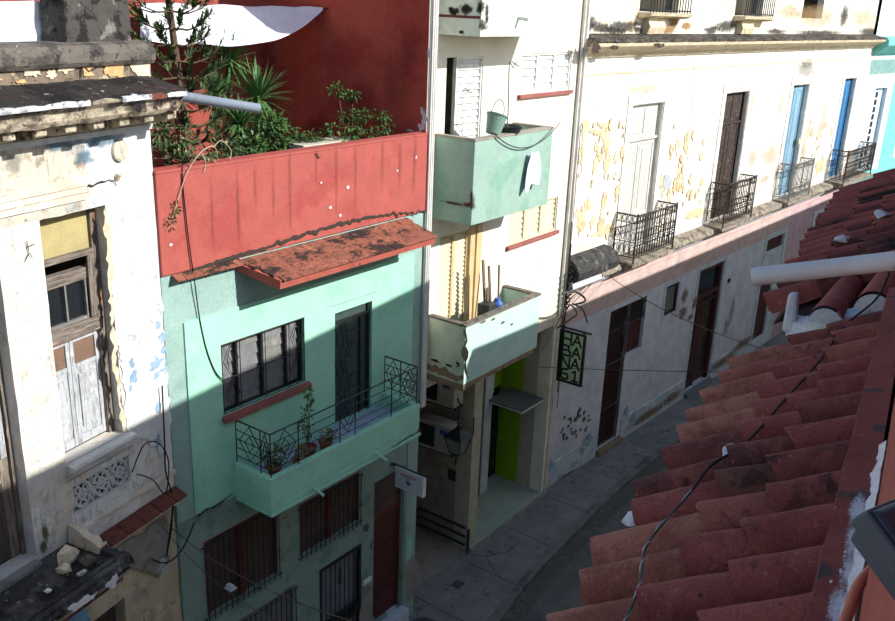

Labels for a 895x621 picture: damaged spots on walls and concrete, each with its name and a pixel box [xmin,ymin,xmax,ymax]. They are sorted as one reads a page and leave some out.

mould [448,1,489,31]
mould [589,17,642,34]
water stain [664,19,690,34]
water stain [704,20,737,34]
water stain [798,7,848,34]
flaking render [15,64,151,84]
peeling [575,119,625,240]
peeling [659,123,707,220]
rust [445,192,475,210]
peeling [103,209,172,456]
spalling [427,328,469,382]
peeling [67,573,119,612]